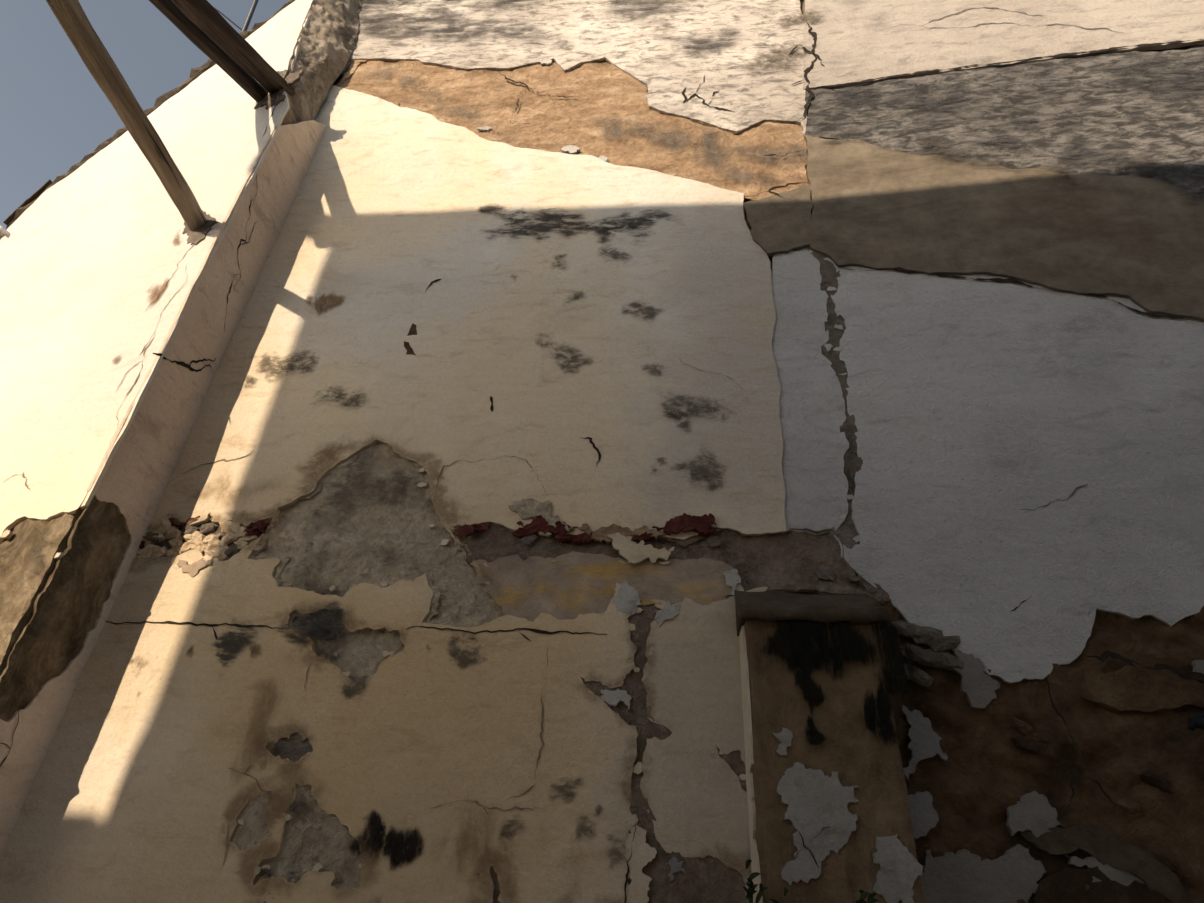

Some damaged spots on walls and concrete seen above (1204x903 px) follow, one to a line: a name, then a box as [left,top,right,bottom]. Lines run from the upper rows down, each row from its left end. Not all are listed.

water stain [746,44,805,70]
water stain [780,12,820,28]
spalling [337,60,809,200]
crack [224,175,258,326]
water stain [479,205,671,259]
crack [105,244,216,463]
crack [106,621,288,640]
spalling [0,438,1204,903]
crack [624,813,637,903]